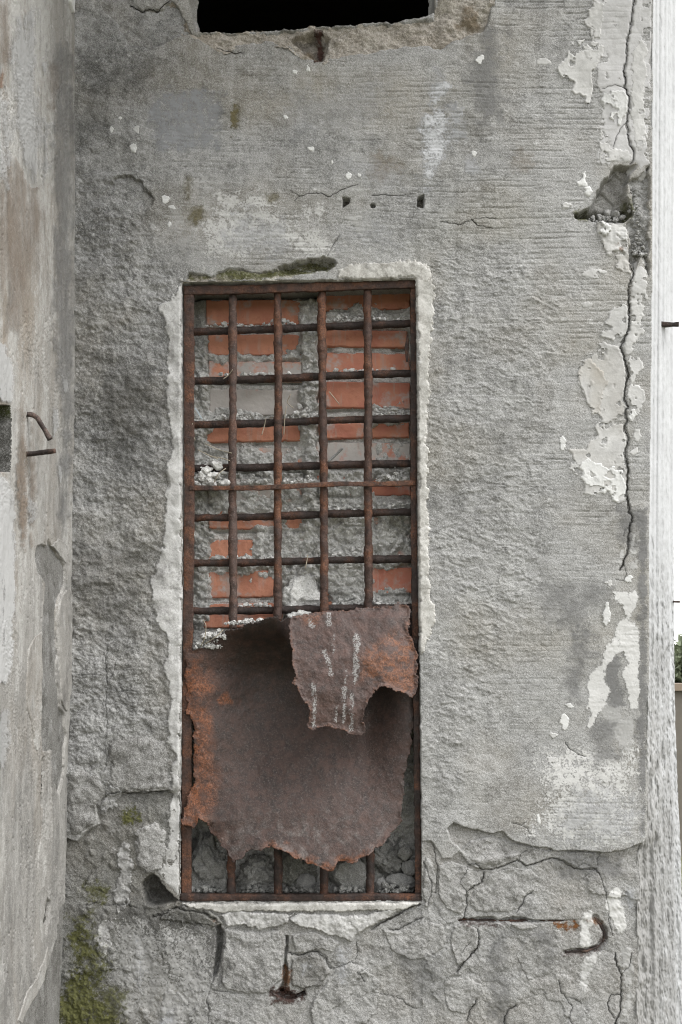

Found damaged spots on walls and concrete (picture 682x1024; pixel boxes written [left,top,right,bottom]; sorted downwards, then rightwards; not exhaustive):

spalling [181,0,495,65]
damp [157,170,373,280]
peeling [536,0,652,504]
crack [620,262,634,579]
corrosion [181,603,419,871]
spalling [17,533,646,1024]
corrosion [269,964,306,1005]
crack [288,850,632,1024]